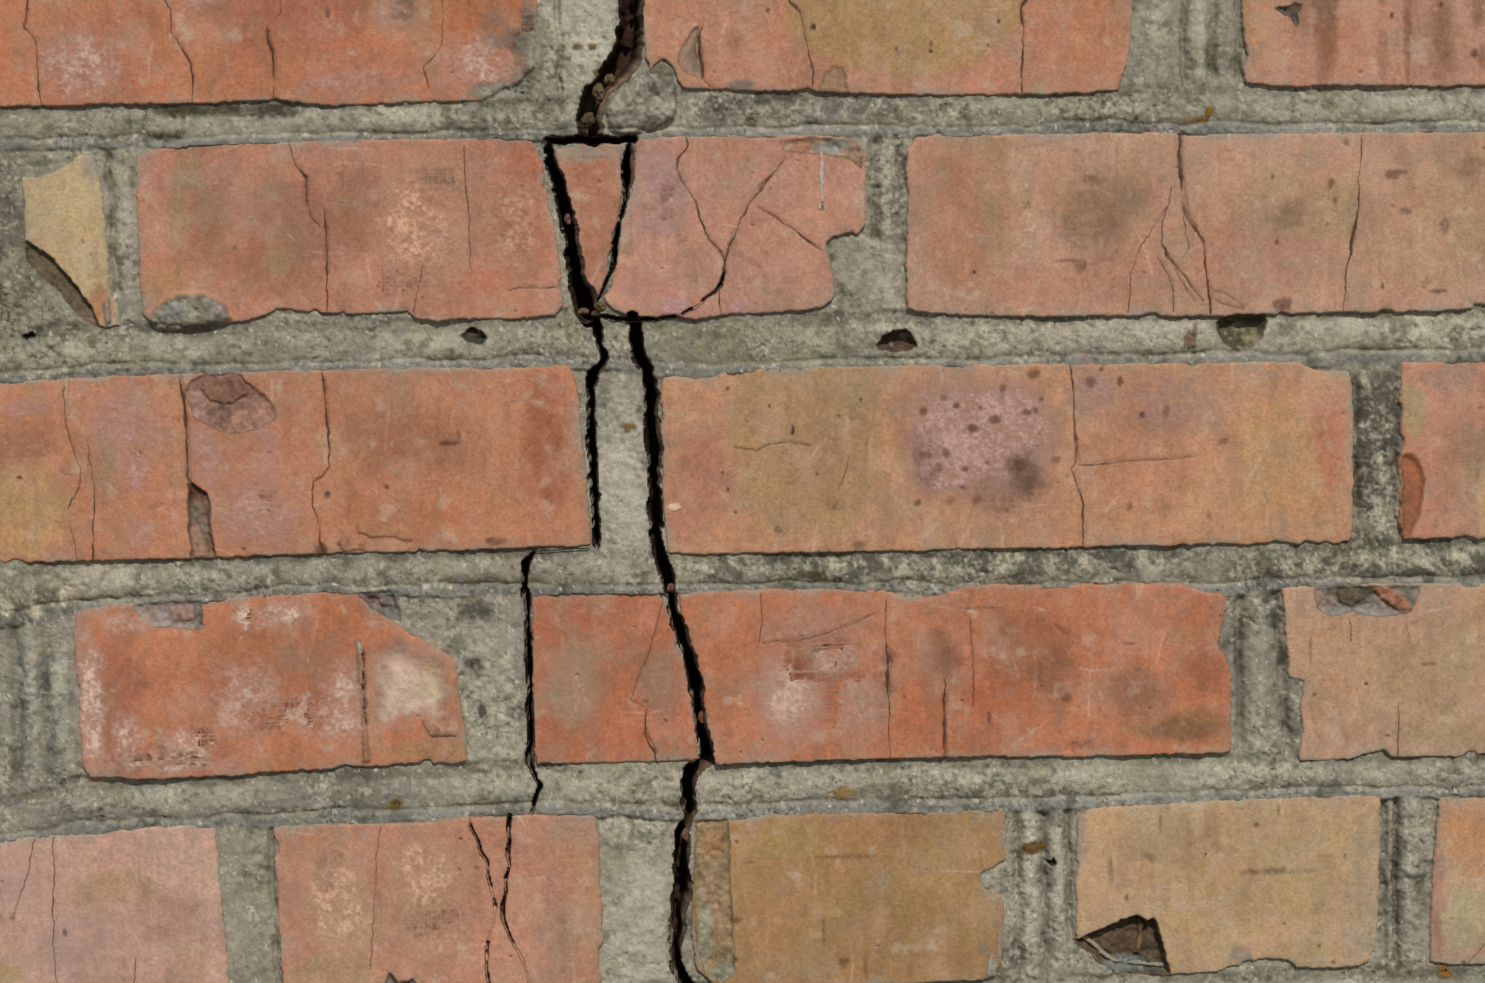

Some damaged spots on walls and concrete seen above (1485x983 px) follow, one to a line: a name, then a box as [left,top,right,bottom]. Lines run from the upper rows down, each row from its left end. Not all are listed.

crack [463,146,472,269]
spalling [25,241,111,326]
spalling [187,479,216,558]
crack [469,0,820,983]
spalling [1074,915,1170,975]